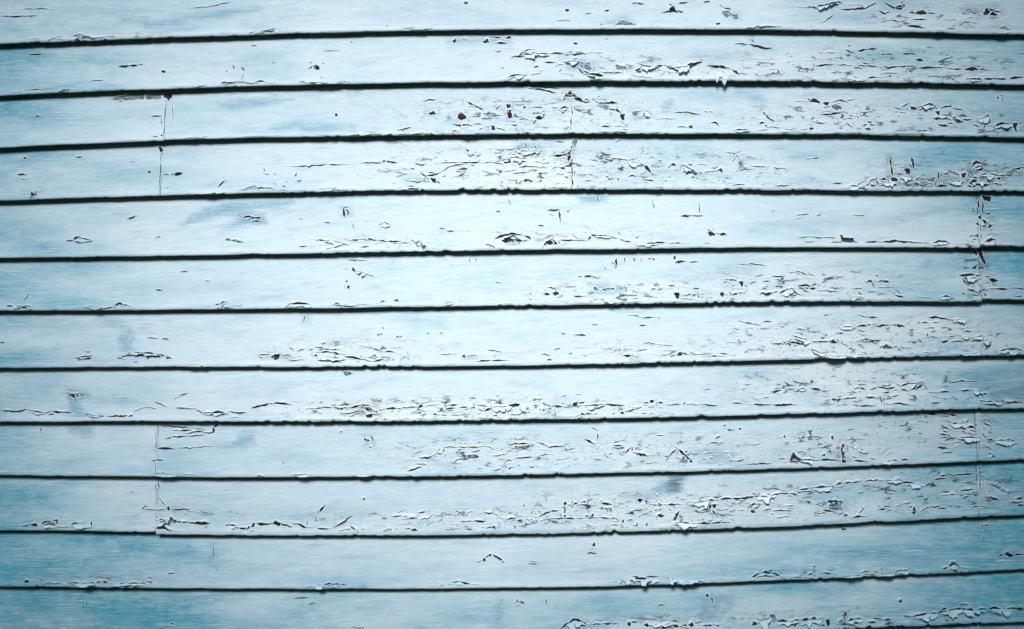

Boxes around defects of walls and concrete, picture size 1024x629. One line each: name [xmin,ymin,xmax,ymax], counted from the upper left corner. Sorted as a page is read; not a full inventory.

peeling [798,0,956,33]
peeling [481,35,740,94]
peeling [348,98,575,136]
peeling [893,101,1019,133]
peeling [398,143,660,190]
peeling [832,159,1024,190]
peeling [485,231,531,250]
peeling [258,326,410,376]
peeling [916,314,1023,356]
peeling [829,378,1023,454]
peeling [583,427,978,556]
peeling [559,617,720,629]